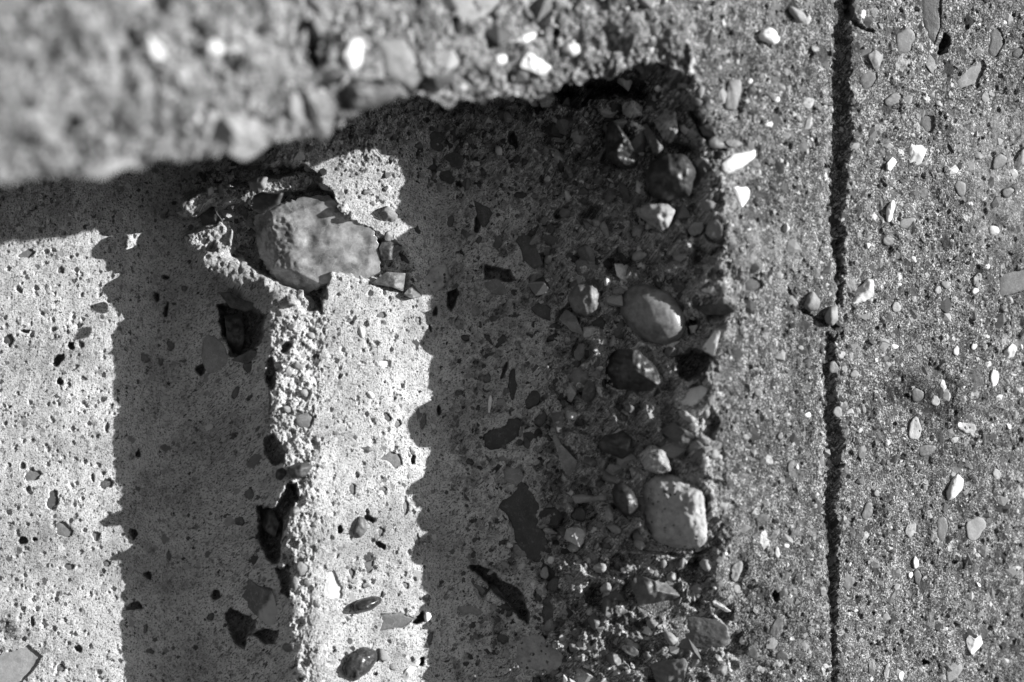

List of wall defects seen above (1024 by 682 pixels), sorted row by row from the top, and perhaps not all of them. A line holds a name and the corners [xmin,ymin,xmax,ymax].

spalling [0,107,420,682]
spalling [396,0,833,682]
crack [786,0,876,682]
peeling [899,78,943,118]
peeling [834,232,1024,678]
peeling [850,114,1014,177]
peeling [967,176,1000,208]